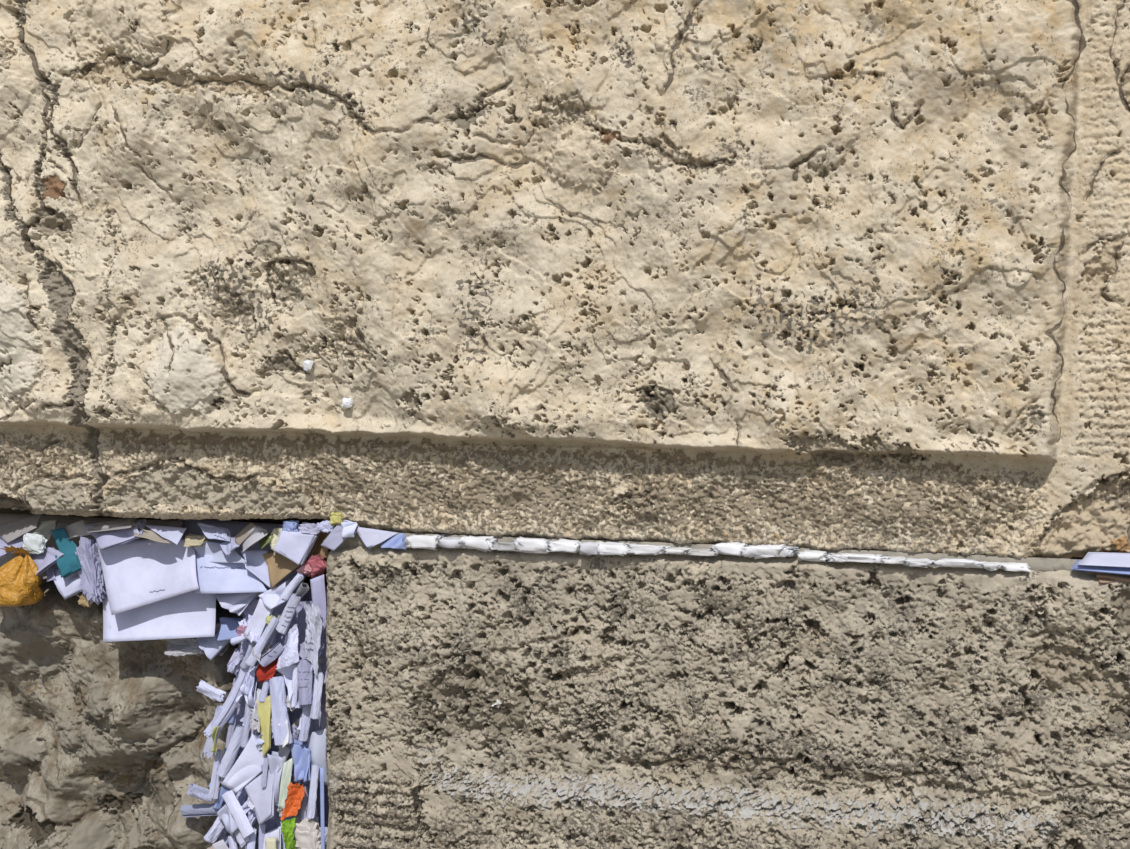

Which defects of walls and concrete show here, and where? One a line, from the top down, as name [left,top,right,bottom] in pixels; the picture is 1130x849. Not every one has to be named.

crack [0,0,535,516]
crack [587,124,736,168]